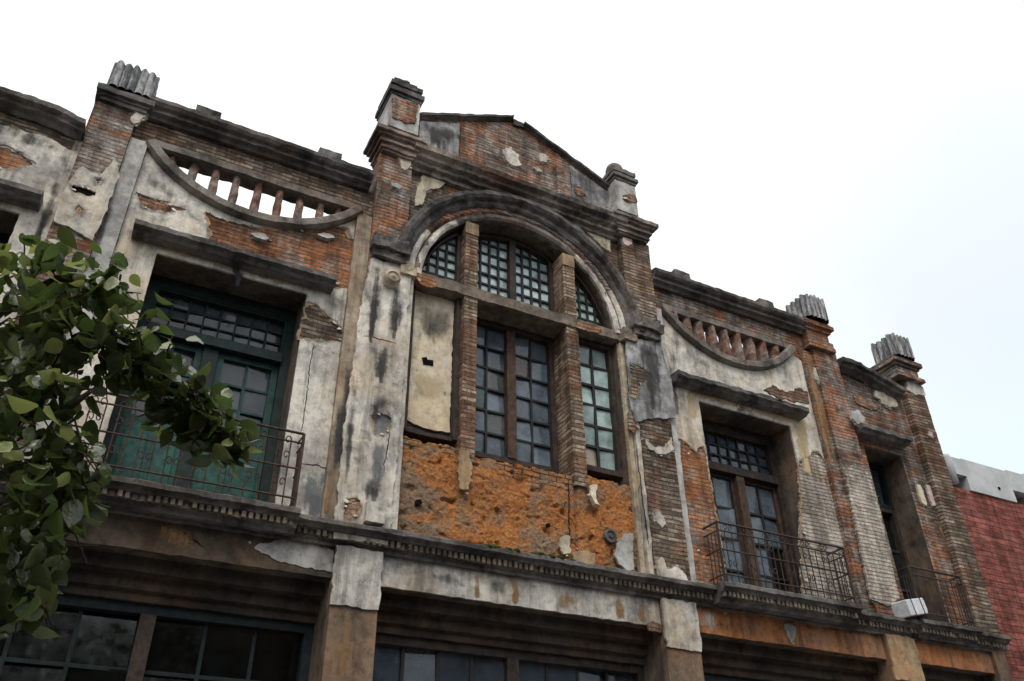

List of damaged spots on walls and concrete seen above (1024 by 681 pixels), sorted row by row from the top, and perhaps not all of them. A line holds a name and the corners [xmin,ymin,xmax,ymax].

flaking render [136,193,185,213]
peeling [398,157,445,207]
flaking render [204,212,353,290]
flaking render [295,302,343,342]
water stain [369,269,379,342]
water stain [391,290,402,337]
water stain [376,348,387,383]
water stain [334,369,351,467]
water stain [366,446,384,501]
flaking render [627,363,726,585]
spalling [397,435,638,572]
peeling [248,539,334,572]